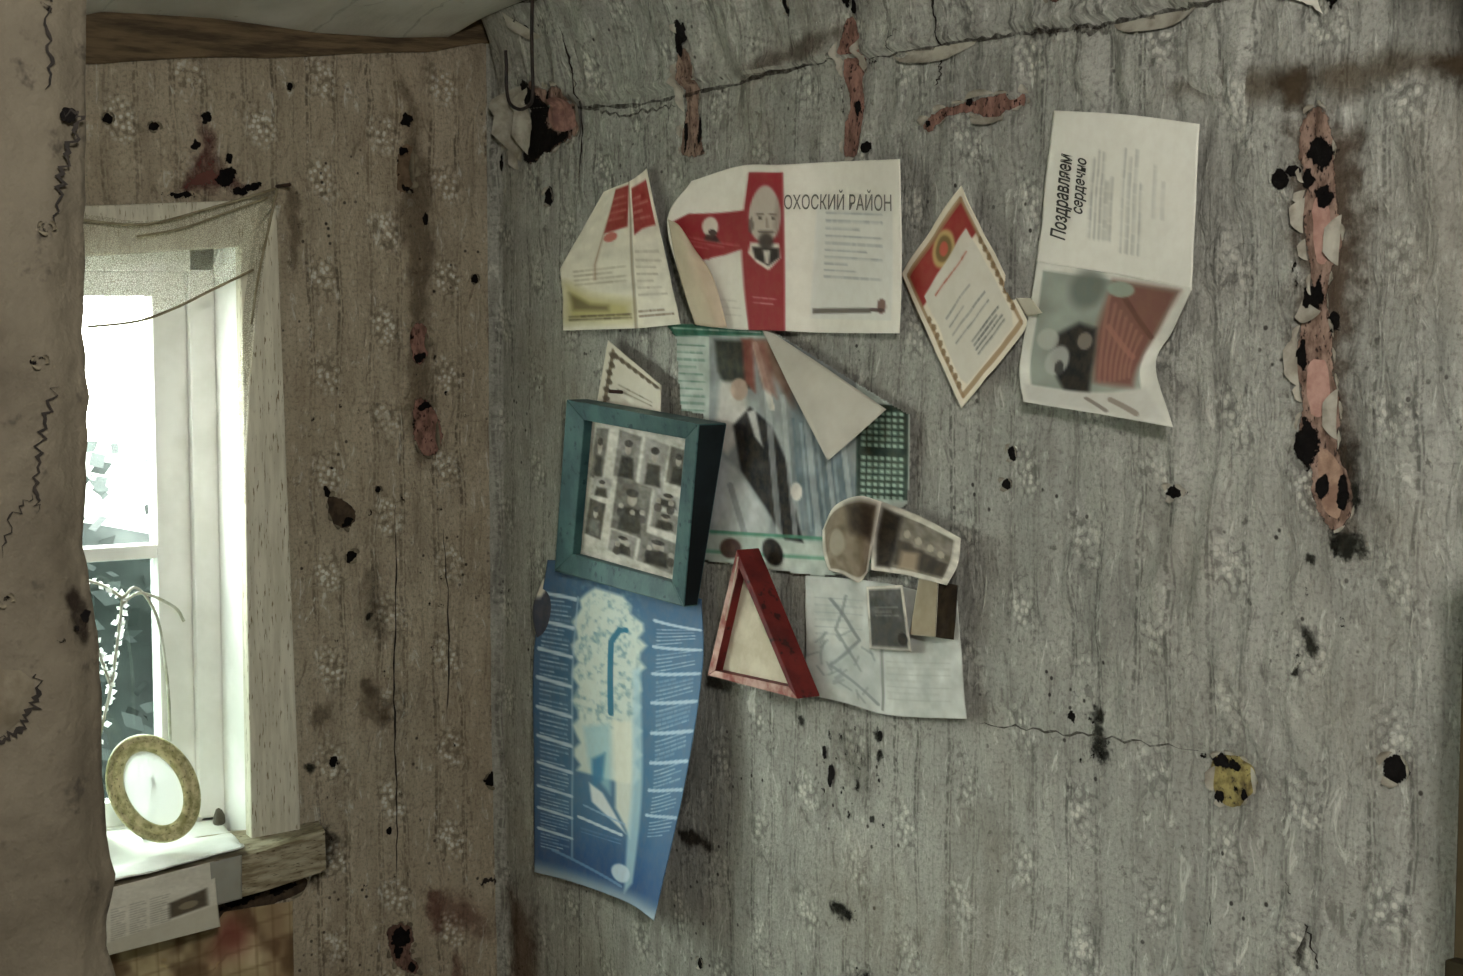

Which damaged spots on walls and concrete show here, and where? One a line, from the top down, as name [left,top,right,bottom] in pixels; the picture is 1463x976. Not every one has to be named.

crack [871,0,1227,86]
crack [506,0,833,175]
peeling [1289,198,1305,233]
peeling [1322,215,1342,266]
peeling [1283,300,1321,387]
peeling [1322,389,1338,440]